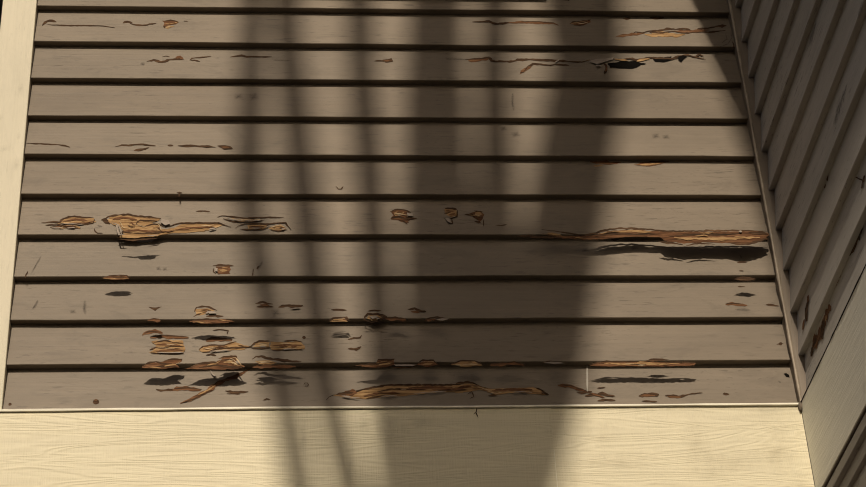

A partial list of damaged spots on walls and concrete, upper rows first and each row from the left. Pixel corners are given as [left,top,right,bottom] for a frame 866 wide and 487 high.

peeling [42,210,291,243]
peeling [390,209,417,224]
peeling [364,310,406,323]
peeling [142,329,188,354]
peeling [189,306,305,356]
peeling [156,369,250,404]
peeling [326,381,549,400]
peeling [558,384,615,401]